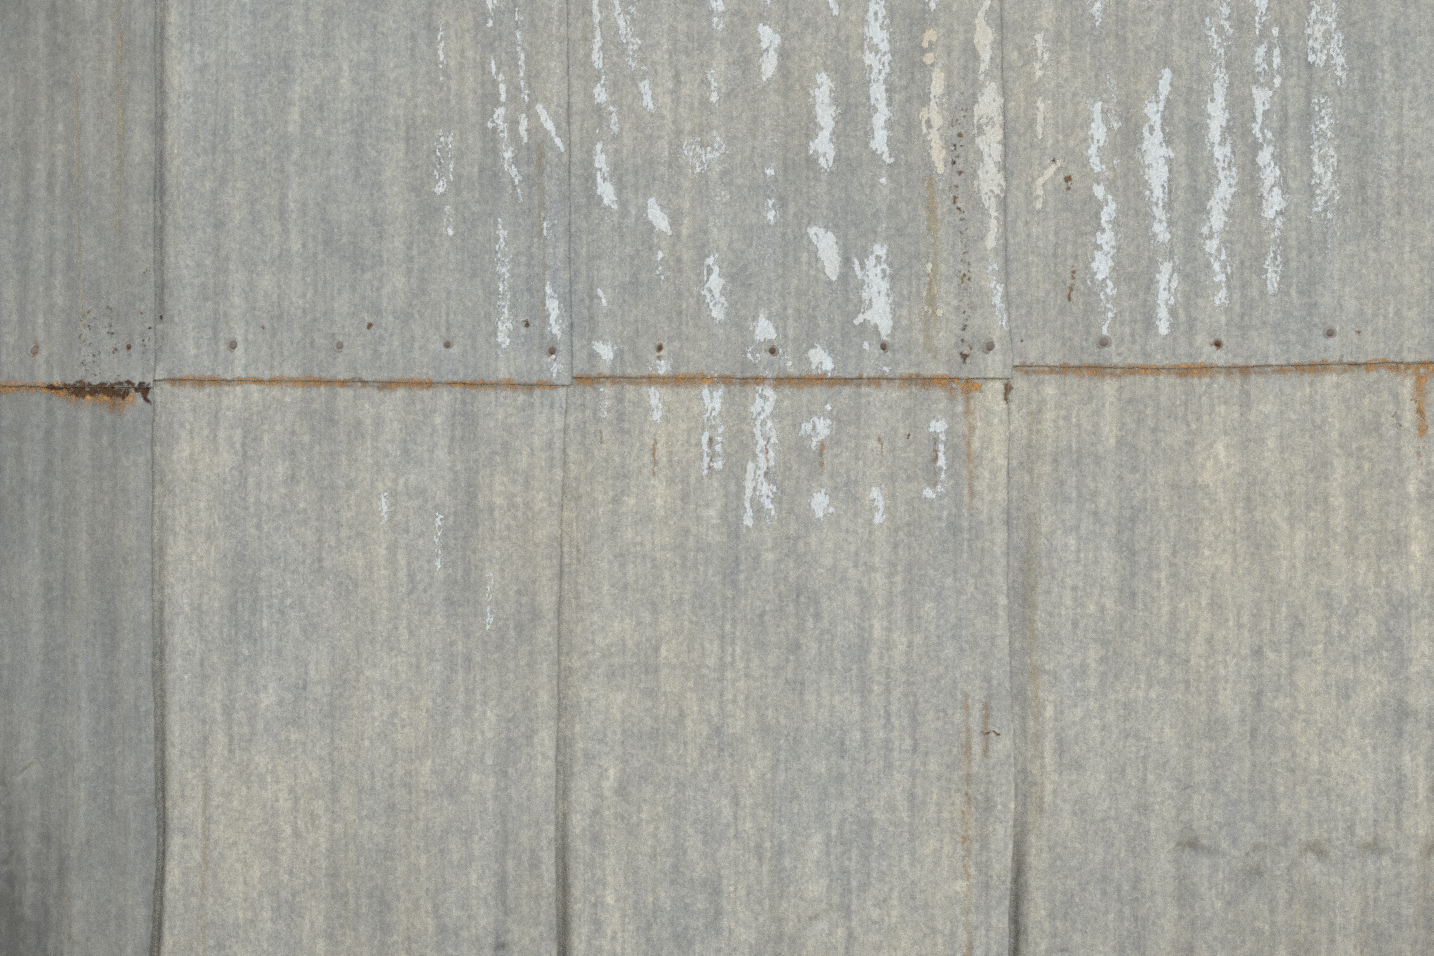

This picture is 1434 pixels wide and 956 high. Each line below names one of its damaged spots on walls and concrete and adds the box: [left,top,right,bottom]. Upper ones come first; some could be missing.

corrosion [166,375,554,390]
peeling [591,0,657,210]
corrosion [577,343,881,386]
peeling [742,313,839,529]
peeling [807,225,894,351]
peeling [862,0,899,185]
corrosion [903,251,982,394]
peeling [969,0,1008,330]
peeling [1085,66,1182,336]
corrosion [1024,344,1257,377]
peeling [1197,0,1289,310]
peeling [1305,0,1347,225]